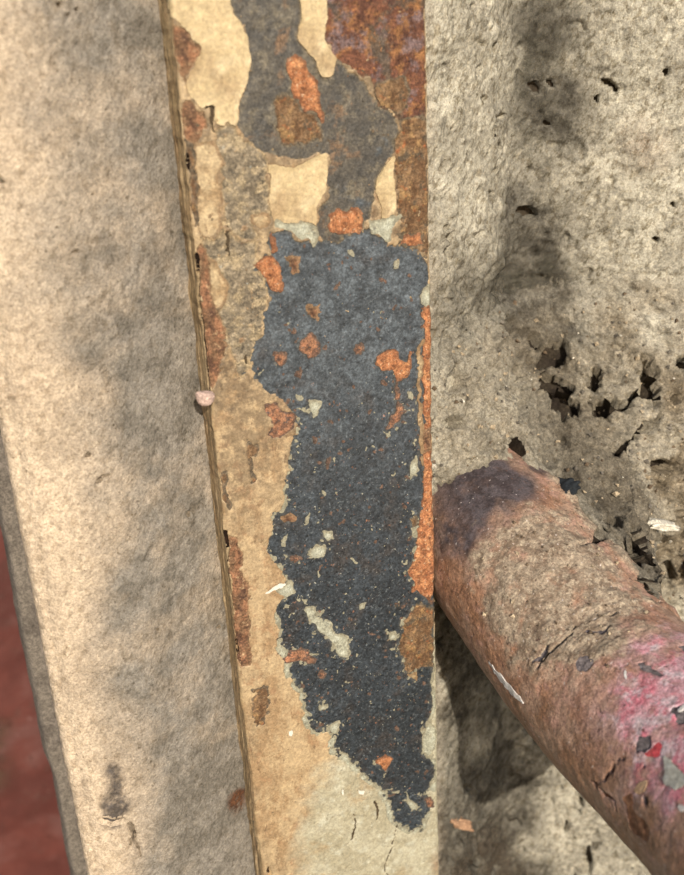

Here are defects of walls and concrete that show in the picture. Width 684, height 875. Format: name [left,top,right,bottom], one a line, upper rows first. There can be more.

rust [172,26,201,82]
rust [325,0,429,259]
peeling [167,0,437,834]
rust [375,305,435,677]
spalling [558,477,581,495]
rust [228,535,253,667]
crack [351,801,397,875]